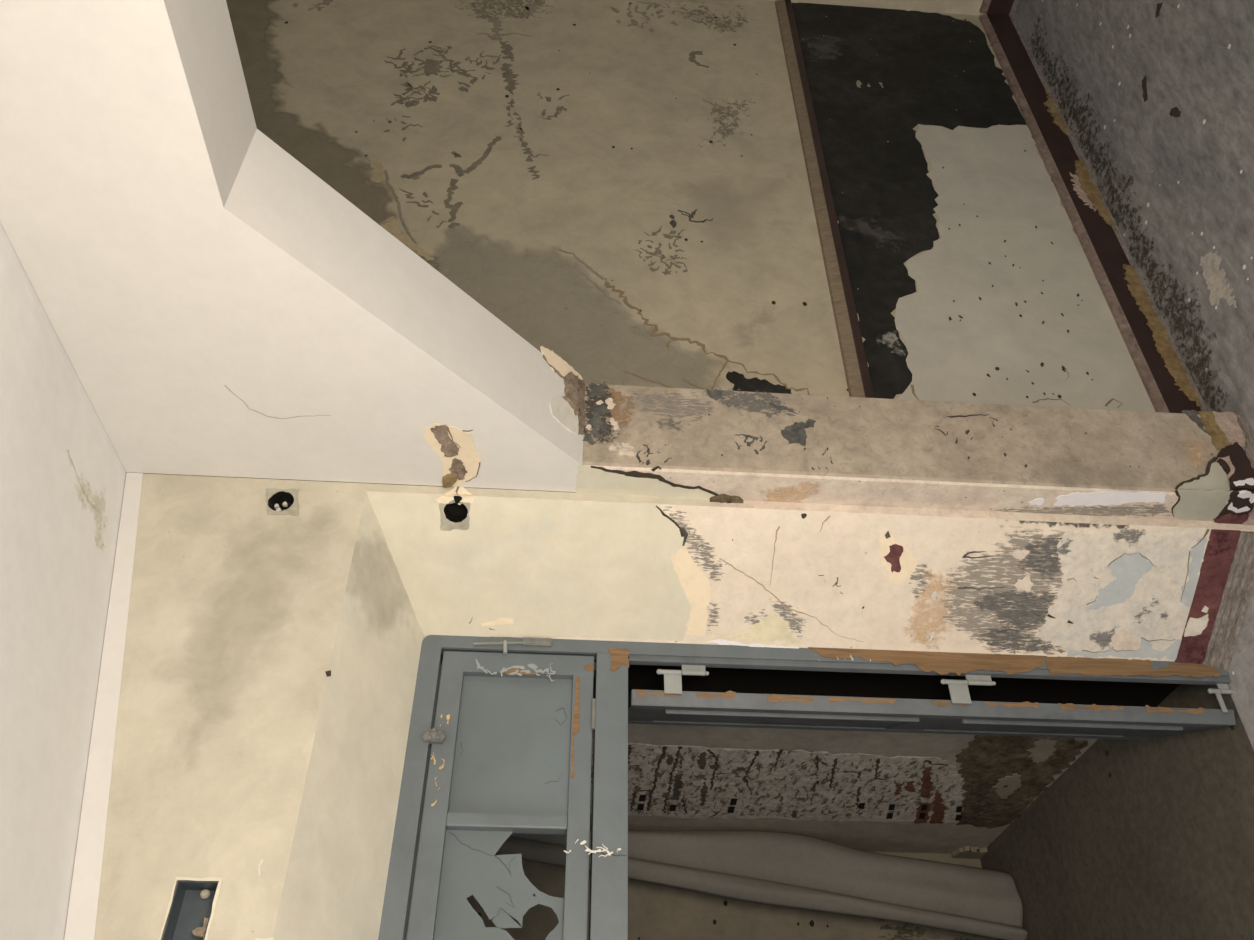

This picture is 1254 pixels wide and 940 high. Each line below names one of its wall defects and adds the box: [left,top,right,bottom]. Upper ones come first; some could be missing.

leakage [226,0,393,235]
peeling [365,0,554,260]
peeling [635,209,713,275]
peeling [791,2,1155,444]
crack [224,385,331,419]
leakage [418,229,711,443]
crack [591,466,719,496]
crack [554,249,811,395]
peeling [366,264,1254,678]
peeling [475,659,556,682]
peeling [570,663,594,777]
flaking render [628,735,1088,829]